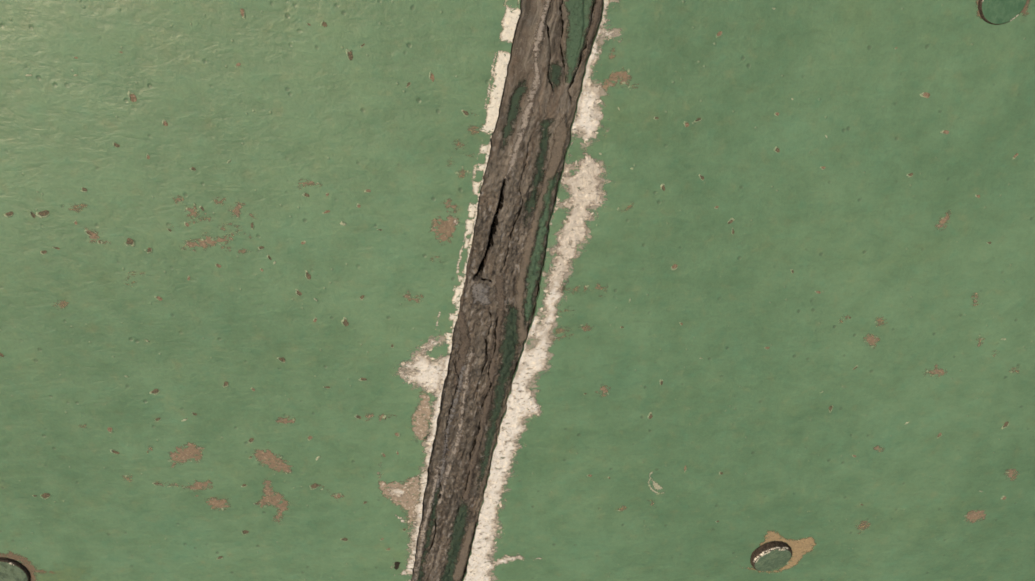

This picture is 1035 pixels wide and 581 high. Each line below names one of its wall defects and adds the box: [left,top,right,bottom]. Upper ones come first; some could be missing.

crack [546,0,596,101]
peeling [173,196,271,271]
peeling [377,0,521,581]
crack [474,151,528,282]
peeling [464,0,639,581]
peeling [248,438,292,522]
crack [426,311,517,581]
spalling [742,531,816,573]